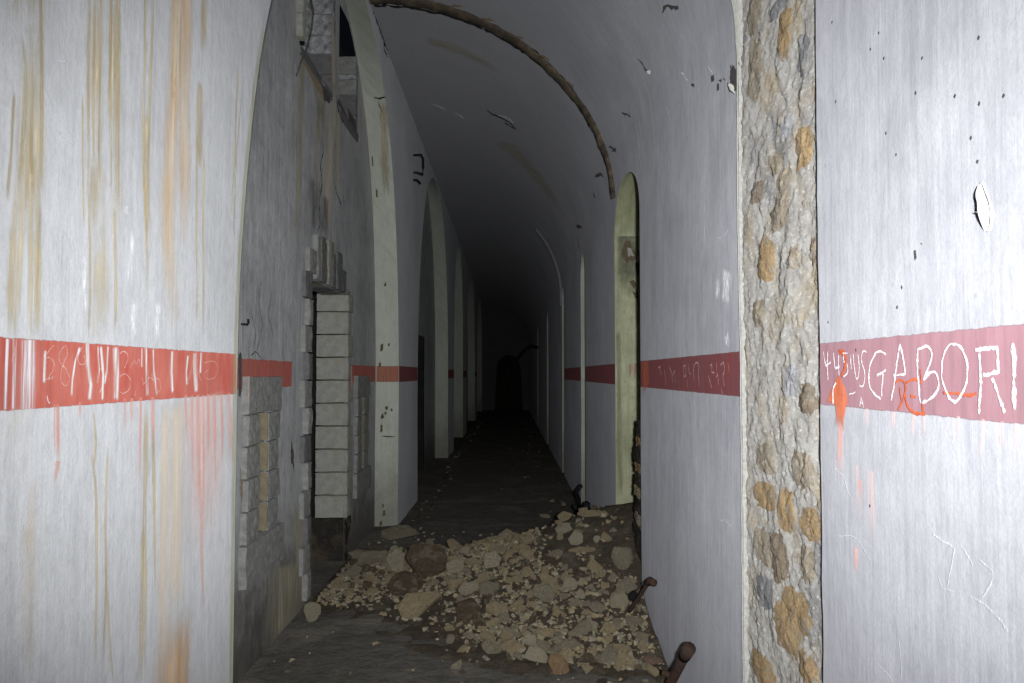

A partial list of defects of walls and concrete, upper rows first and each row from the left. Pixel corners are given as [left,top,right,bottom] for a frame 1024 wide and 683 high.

rust [164,0,190,261]
peeling [621,240,640,300]
flaking render [708,0,829,683]